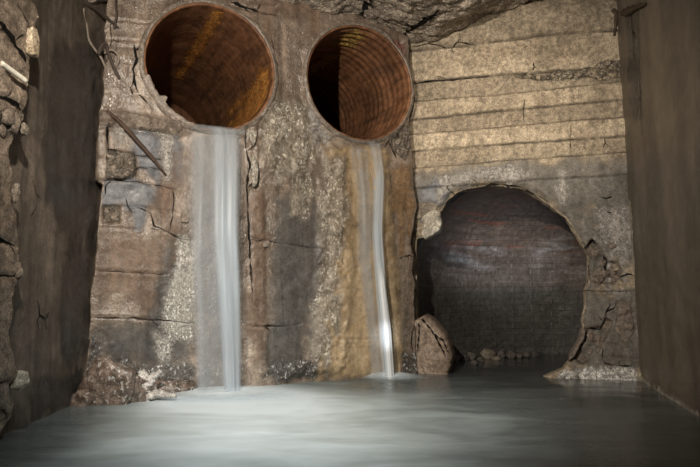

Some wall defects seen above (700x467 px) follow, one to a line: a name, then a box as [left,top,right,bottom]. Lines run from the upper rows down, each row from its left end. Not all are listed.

crack [106,22,153,109]
rust [175,9,224,80]
rust [224,67,270,130]
spalling [515,60,620,81]
damp [31,42,199,419]
crack [104,125,188,240]
crack [245,130,316,300]
rust [315,145,414,381]